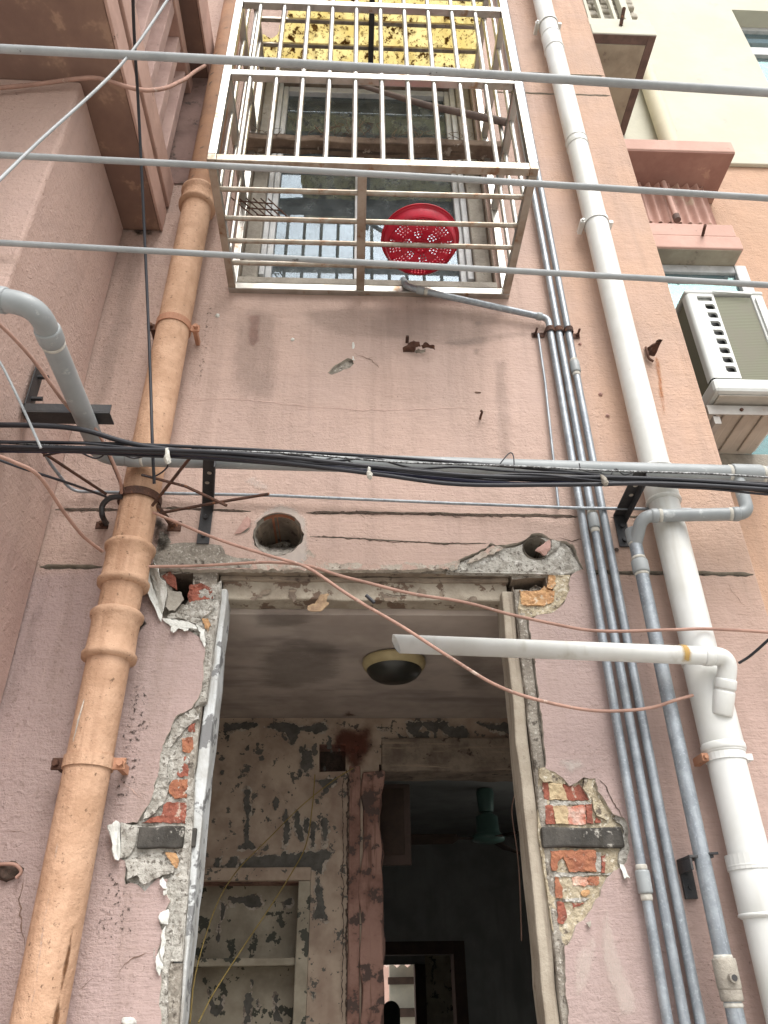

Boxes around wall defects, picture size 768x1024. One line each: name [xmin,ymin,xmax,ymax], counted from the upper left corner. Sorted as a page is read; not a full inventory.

crack [309,510,579,549]
flaking render [107,531,582,1024]
flaking render [537,767,630,945]